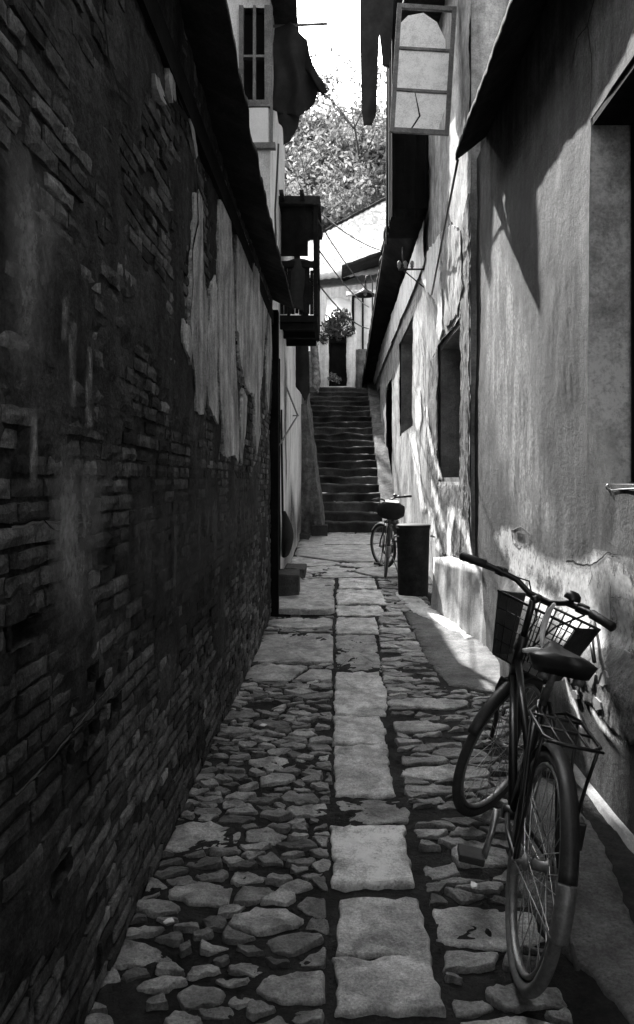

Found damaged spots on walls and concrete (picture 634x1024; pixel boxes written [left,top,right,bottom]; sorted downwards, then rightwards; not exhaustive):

flaking render [151,68,176,105]
flaking render [186,118,198,159]
flaking render [181,189,272,466]
flaking render [494,526,634,745]
crack [566,552,629,646]